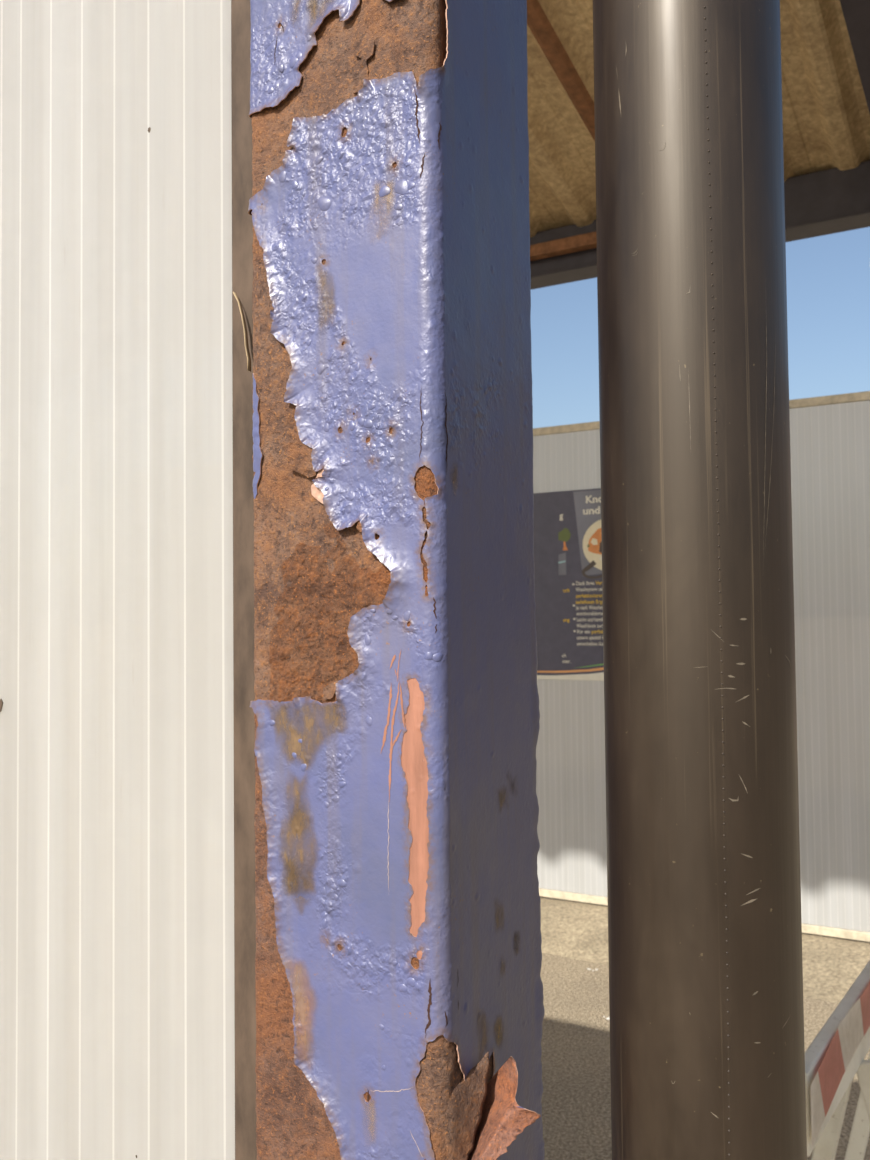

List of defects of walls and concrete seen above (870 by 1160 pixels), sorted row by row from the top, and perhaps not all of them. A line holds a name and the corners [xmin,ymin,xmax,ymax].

peeling [252,0,443,205]
peeling [415,465,438,596]
corrosion [275,704,343,766]
peeling [233,226,391,1160]
corrosion [283,779,314,898]
spalling [411,950,422,969]
peeling [416,1035,541,1160]